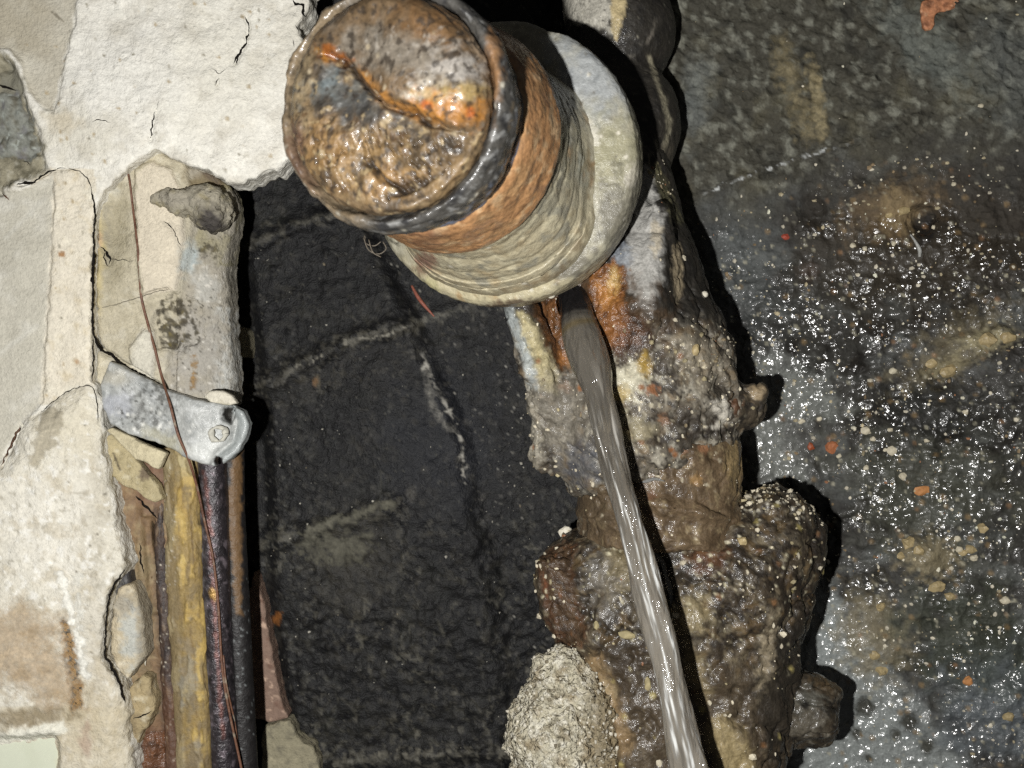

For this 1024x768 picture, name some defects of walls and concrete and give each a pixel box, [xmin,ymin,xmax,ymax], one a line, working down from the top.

crack [213,19,250,83]
crack [293,0,305,45]
peeling [239,326,255,358]
rust [536,298,568,372]
rust [588,259,652,356]
peeling [204,390,239,405]
peeling [107,427,169,502]
flaking render [111,580,155,679]
flaking render [250,569,292,722]
rust [141,730,166,768]